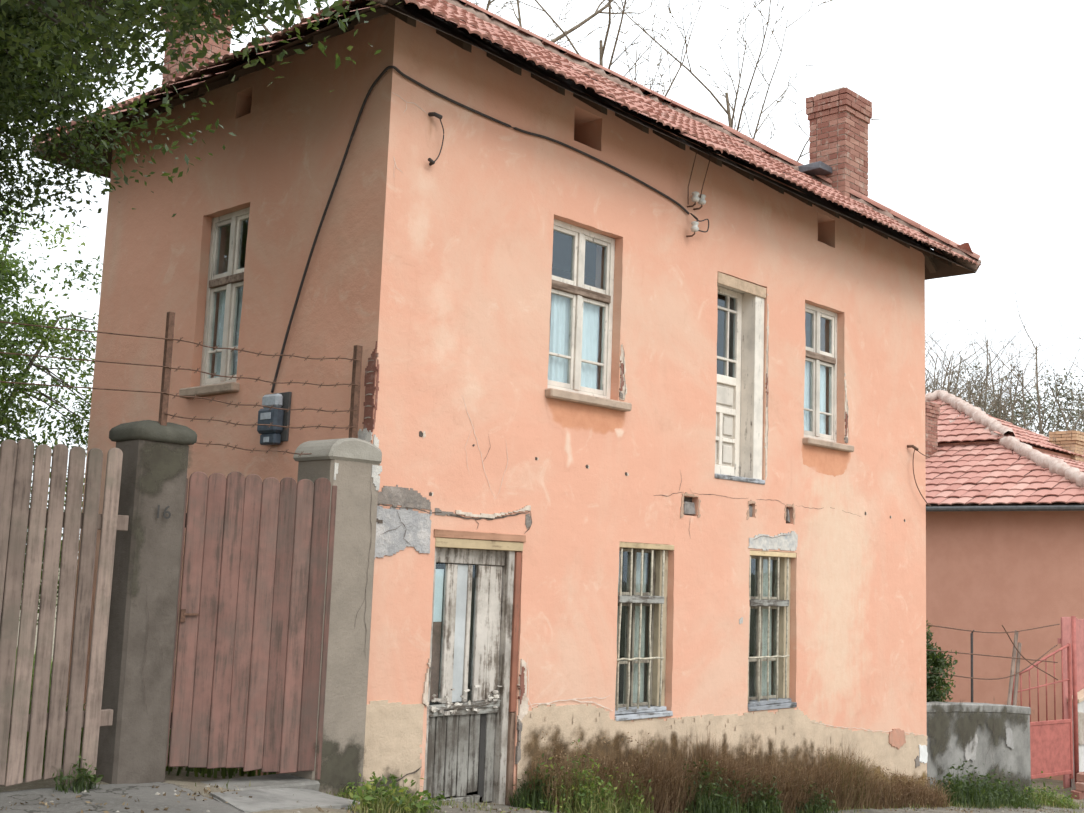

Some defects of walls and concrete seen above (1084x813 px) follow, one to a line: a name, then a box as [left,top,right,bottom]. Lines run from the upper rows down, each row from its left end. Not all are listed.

peeling [371,465,456,524]
crack [354,399,532,657]
water stain [545,397,628,472]
water stain [801,443,852,477]
water stain [927,704,1028,774]